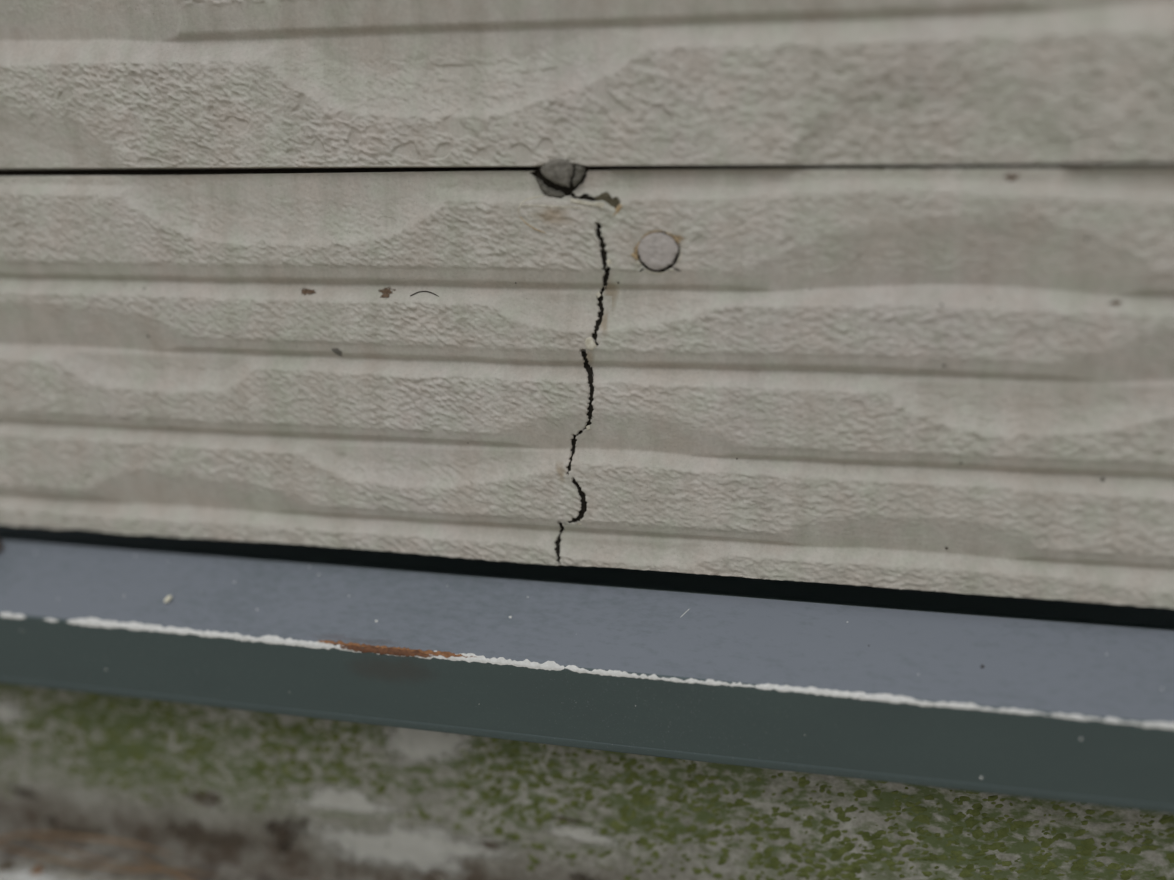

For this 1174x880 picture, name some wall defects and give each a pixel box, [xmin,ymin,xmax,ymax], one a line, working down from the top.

spalling [532,158,623,216]
crack [555,224,612,567]
corrosion [318,640,472,658]